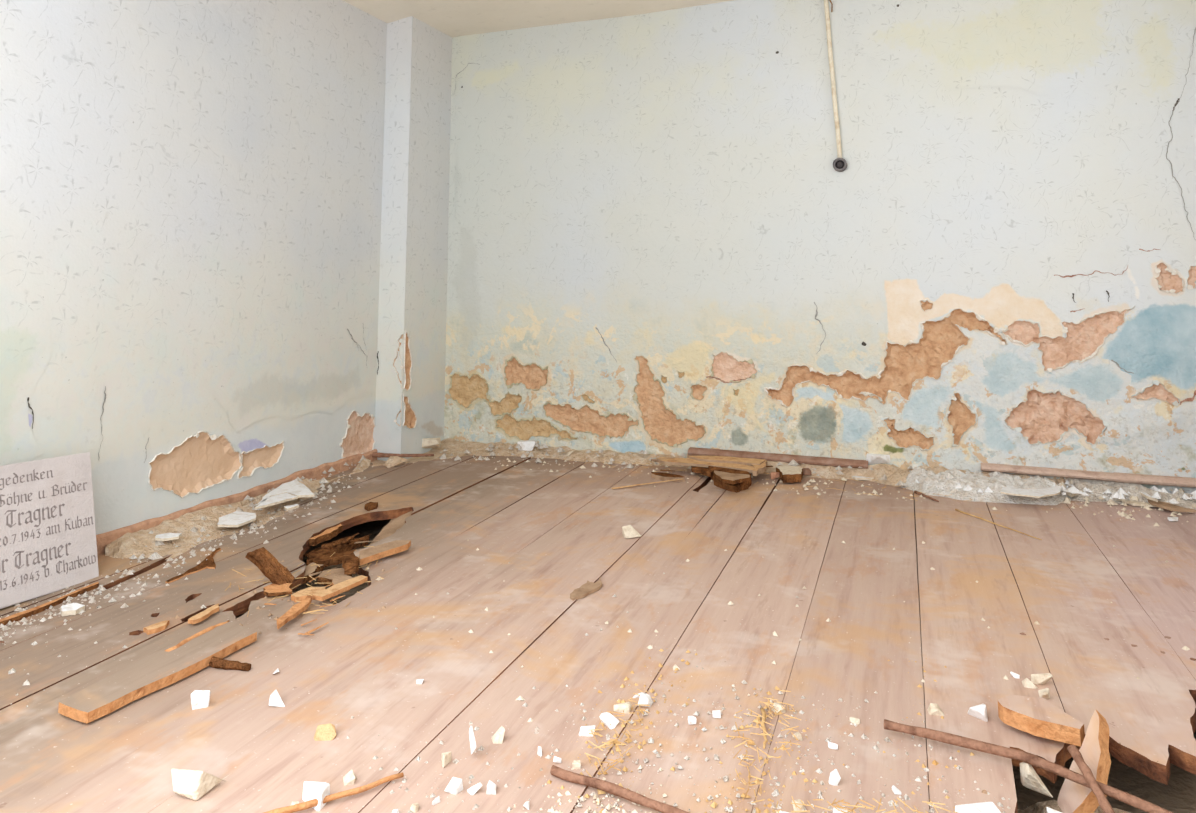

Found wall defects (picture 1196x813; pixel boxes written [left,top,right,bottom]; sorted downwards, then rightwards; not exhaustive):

crack [1166,28,1196,239]
crack [1054,249,1161,312]
spalling [393,330,417,429]
spalling [447,257,1196,459]
spalling [148,431,284,498]
spalling [339,411,376,459]